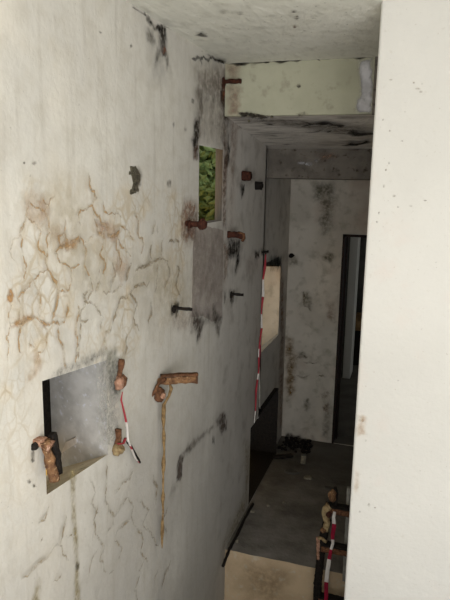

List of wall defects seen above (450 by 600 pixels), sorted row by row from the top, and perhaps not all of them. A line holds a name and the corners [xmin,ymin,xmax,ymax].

damp [147,17,168,64]
spalling [129,166,141,195]
crack [6,181,179,366]
damp [224,238,240,272]
crack [89,466,157,582]